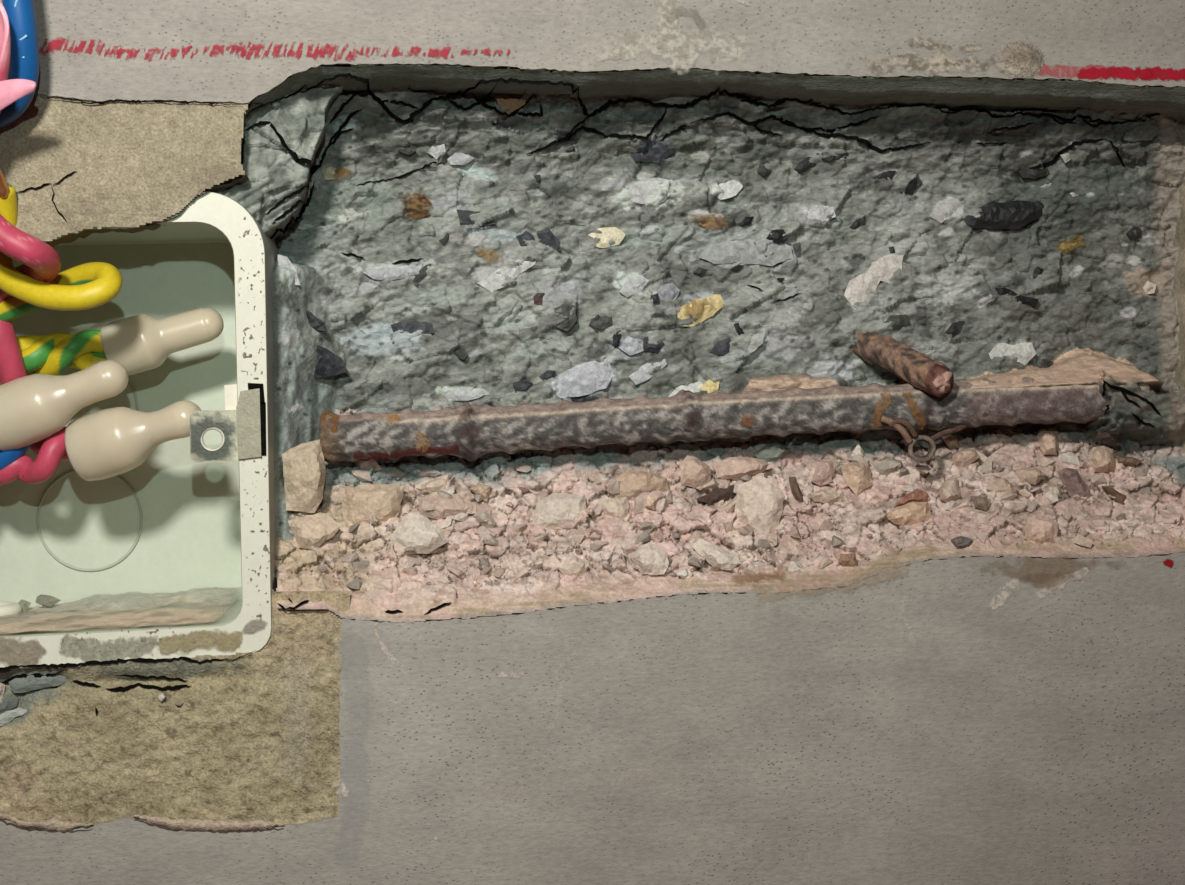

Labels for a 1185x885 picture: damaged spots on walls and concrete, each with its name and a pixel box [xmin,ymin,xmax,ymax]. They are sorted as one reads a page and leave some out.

crack [37,73,1152,239]
spalling [0,64,1185,623]
corrosion [872,392,926,429]
crack [1102,380,1161,427]
crack [0,650,256,716]
flaking render [0,589,350,833]